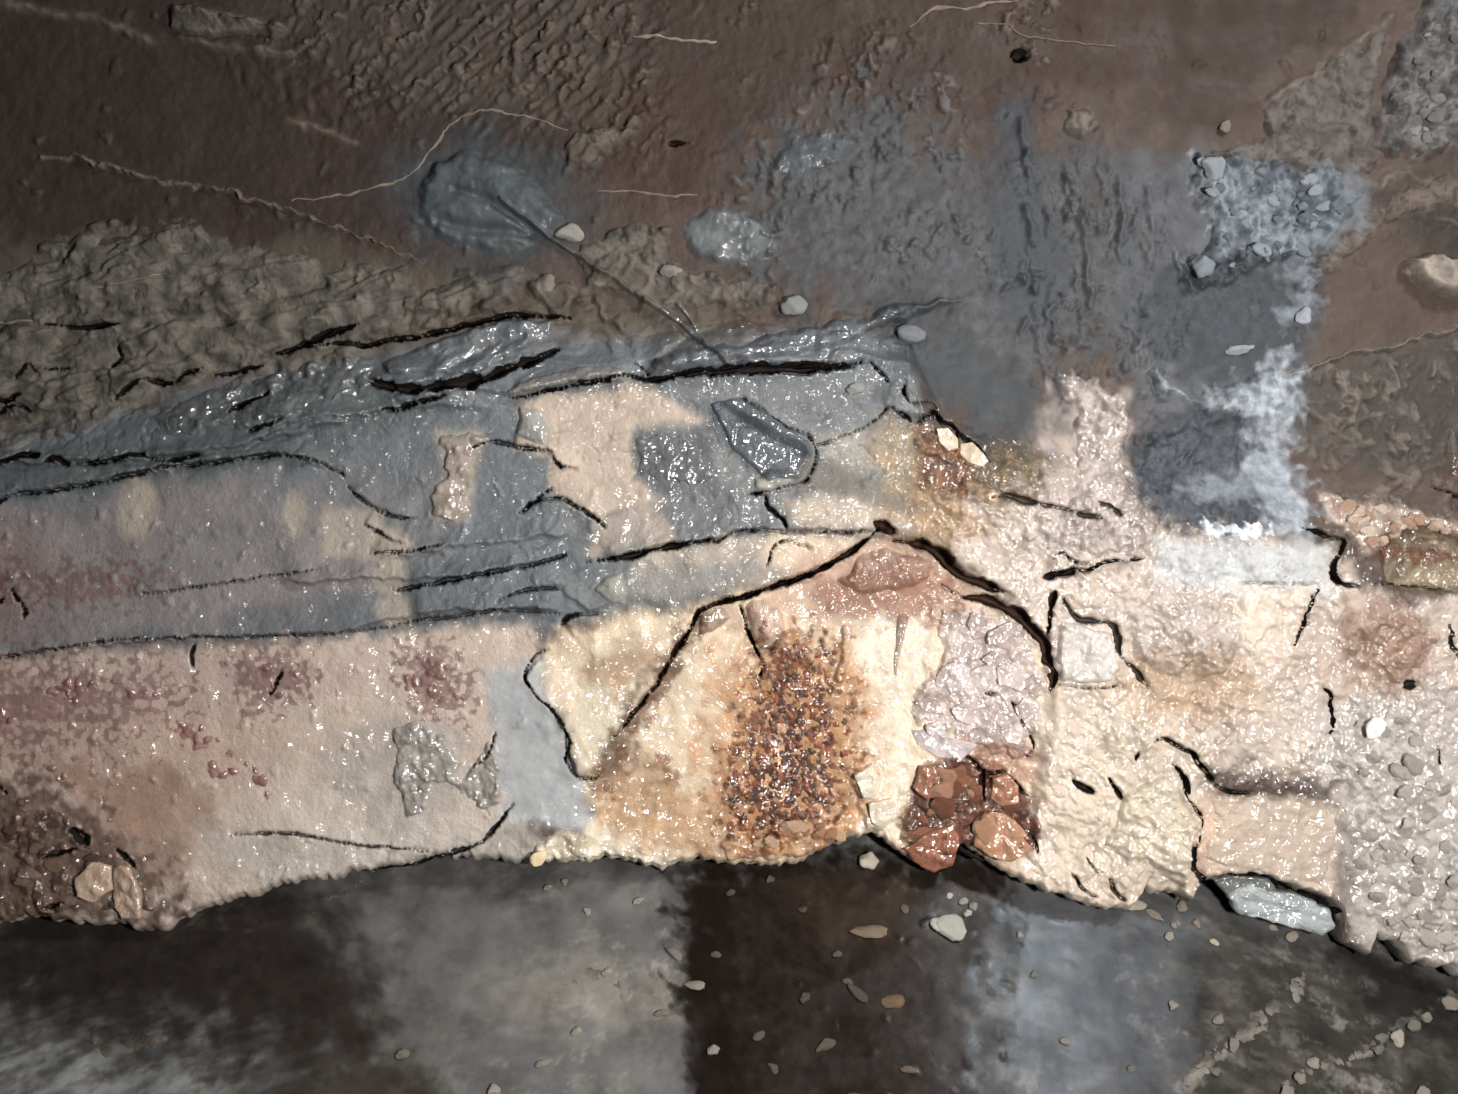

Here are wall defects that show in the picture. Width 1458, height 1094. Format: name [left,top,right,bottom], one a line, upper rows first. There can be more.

leakage [747,99,1330,583]
crack [0,273,1150,780]
crack [1245,527,1458,657]
rust [1380,526,1458,593]
crack [966,692,1035,802]
crack [1322,687,1336,734]
crack [41,828,136,868]
crack [230,805,513,872]
rust [593,557,1040,1094]
crack [1071,737,1342,932]
leakage [0,892,397,1094]
leakage [1338,947,1458,1031]